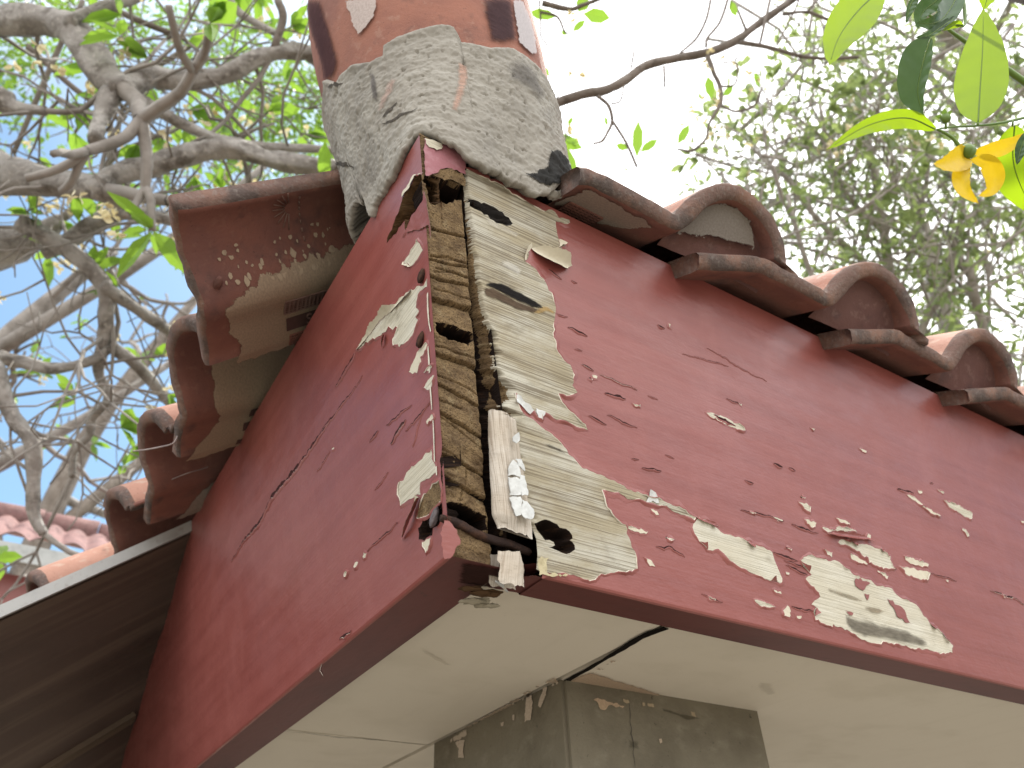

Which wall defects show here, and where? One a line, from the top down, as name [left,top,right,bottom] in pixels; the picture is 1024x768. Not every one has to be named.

peeling [402,192,431,268]
peeling [356,277,435,393]
crack [231,350,362,563]
crack [367,523,398,552]
crack [369,402,431,447]
peeling [397,445,443,538]
peeling [422,535,433,555]
peeling [457,167,954,658]
peeling [905,488,973,538]